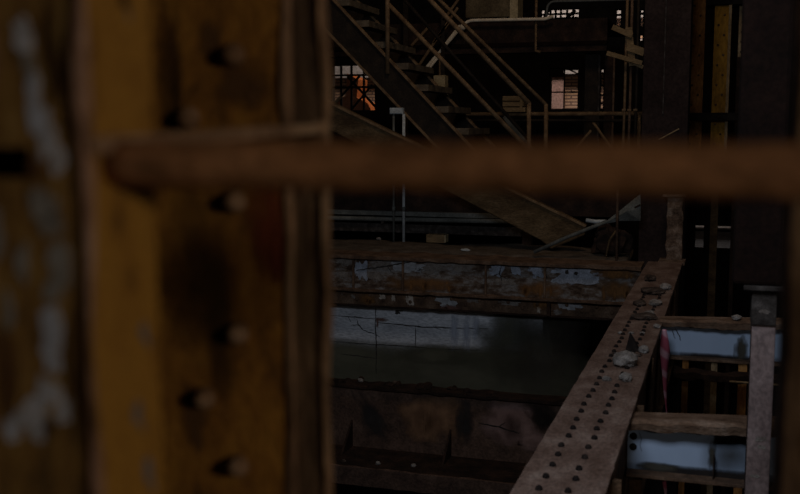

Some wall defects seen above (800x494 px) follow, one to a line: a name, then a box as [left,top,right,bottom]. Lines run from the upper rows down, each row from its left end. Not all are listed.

peeling [489,265,603,286]
crack [333,307,484,372]
corrosion [482,403,543,449]